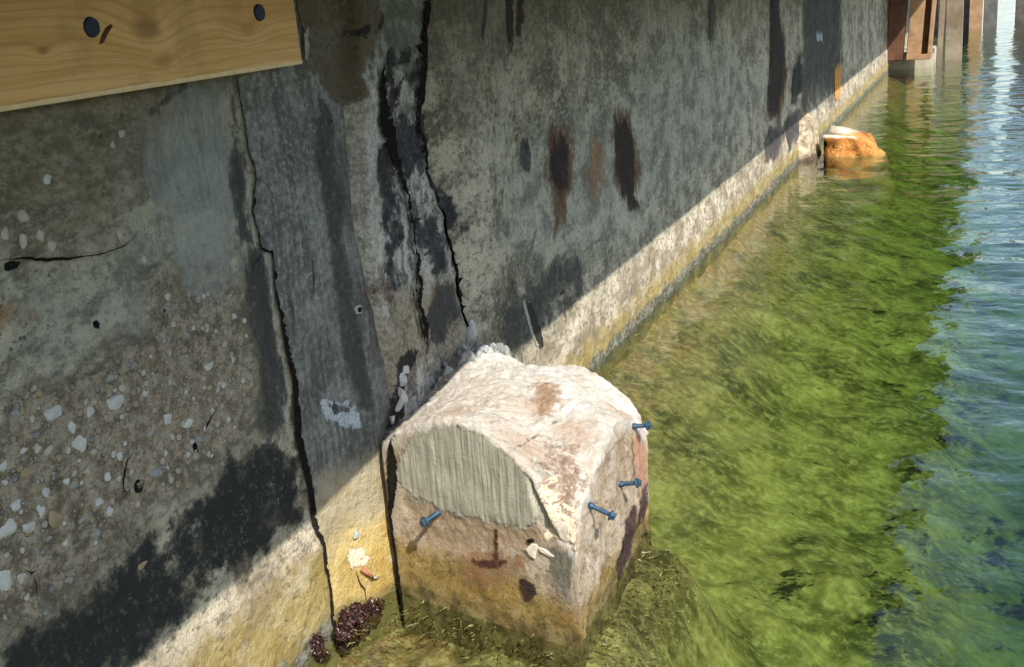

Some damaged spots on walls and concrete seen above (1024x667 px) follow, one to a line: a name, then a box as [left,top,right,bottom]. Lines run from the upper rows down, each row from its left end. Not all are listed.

rust [544,121,580,238]
rust [611,103,642,212]
crack [4,239,133,276]
crack [237,79,347,655]
crack [380,0,469,619]
rust [471,529,508,569]